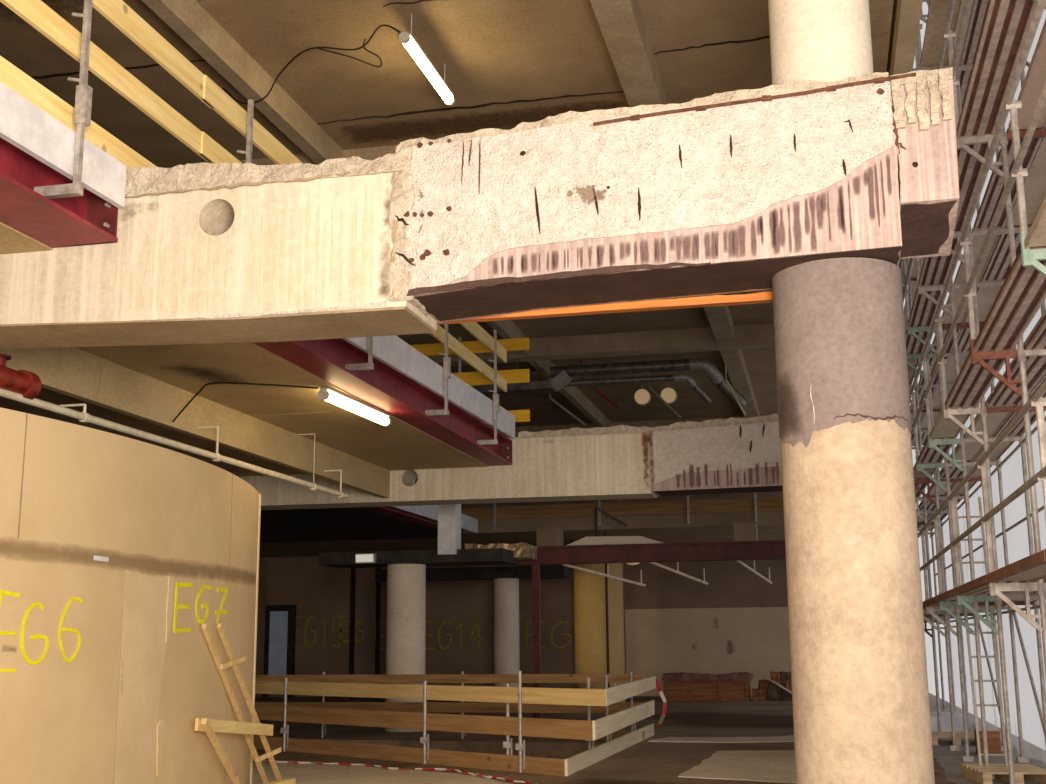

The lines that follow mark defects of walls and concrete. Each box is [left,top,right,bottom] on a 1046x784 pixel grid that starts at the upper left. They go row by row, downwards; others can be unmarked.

crack [383,0,434,8]
crack [654,35,770,55]
crack [317,91,624,124]
spalling [192,72,894,319]
spalling [900,200,957,258]
rust [409,249,450,262]
spalling [653,414,782,484]
water stain [0,544,255,582]